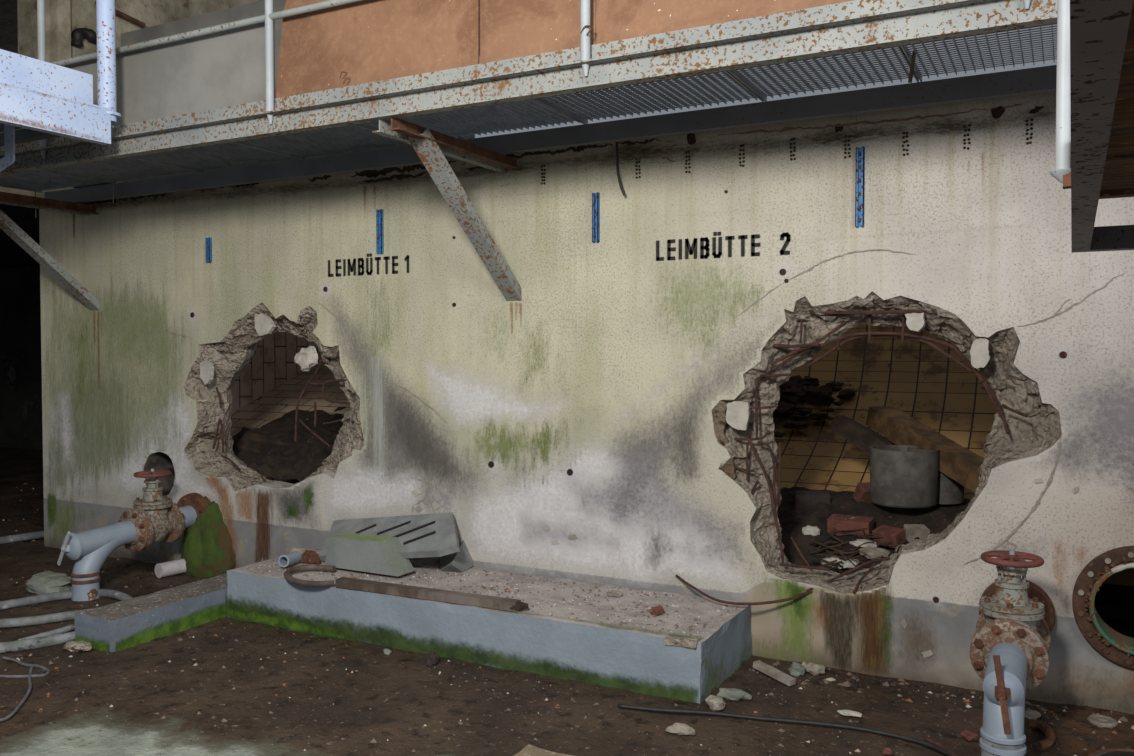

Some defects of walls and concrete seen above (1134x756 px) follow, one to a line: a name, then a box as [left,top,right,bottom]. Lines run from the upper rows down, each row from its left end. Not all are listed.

crack [735,249,917,318]
crack [1024,271,1127,326]
spalling [144,452,175,496]
damp [118,397,214,495]
corrosion [207,477,310,562]
spalling [184,303,364,491]
damp [330,319,465,512]
damp [432,370,552,425]
damp [470,394,741,586]
spalling [712,291,1062,594]
crack [964,437,1061,565]
corrosion [816,587,890,673]